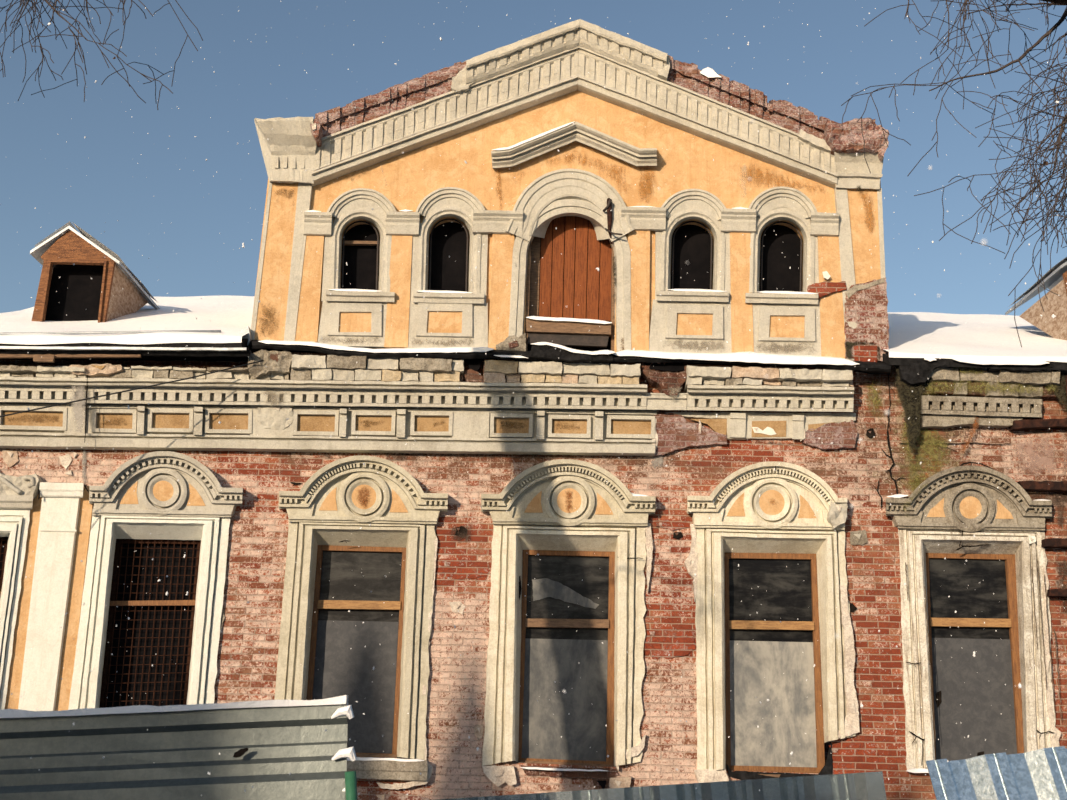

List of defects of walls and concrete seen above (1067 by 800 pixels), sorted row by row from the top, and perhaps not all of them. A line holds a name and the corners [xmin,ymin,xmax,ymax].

spalling [807,271,889,362]
peeling [644,363,685,372]
peeling [752,427,776,435]
water stain [894,368,933,453]
crack [874,375,1005,508]
rust [1029,491,1067,526]